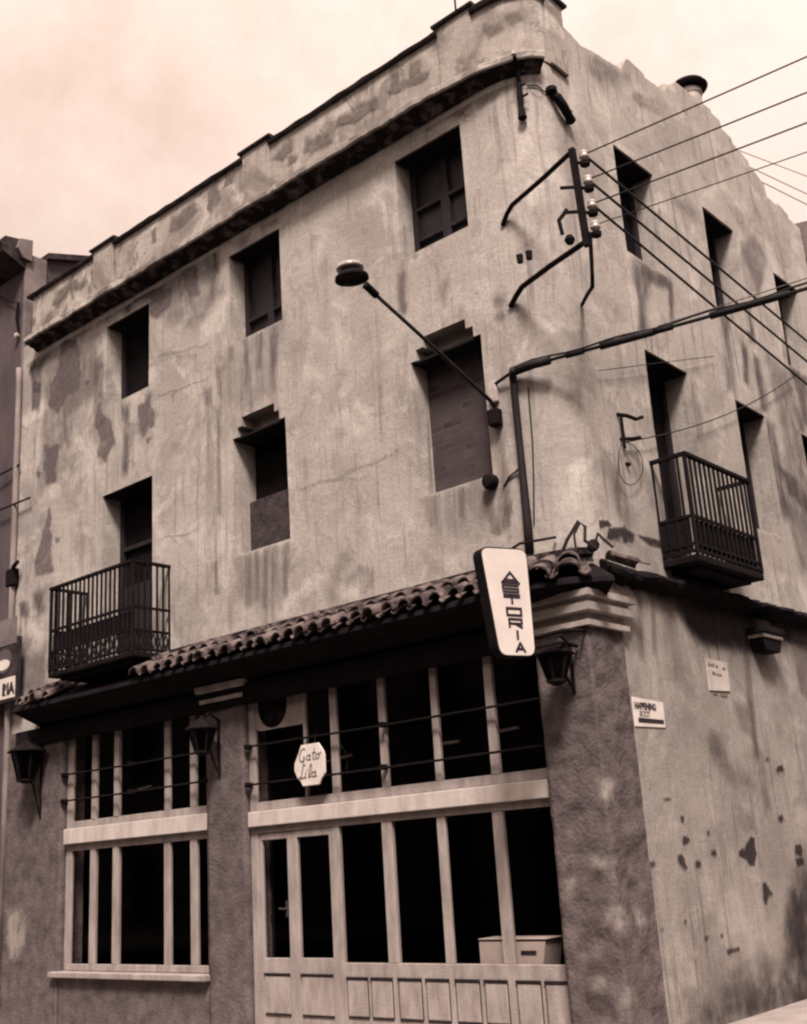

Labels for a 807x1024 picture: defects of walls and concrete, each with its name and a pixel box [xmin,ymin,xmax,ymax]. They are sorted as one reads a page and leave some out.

peeling [33,339,89,412]
peeling [95,410,115,460]
peeling [138,400,154,442]
peeling [36,444,59,483]
peeling [35,508,59,575]
spalling [678,836,702,869]
spalling [739,835,758,870]
spalling [795,844,804,866]
spalling [763,883,773,903]